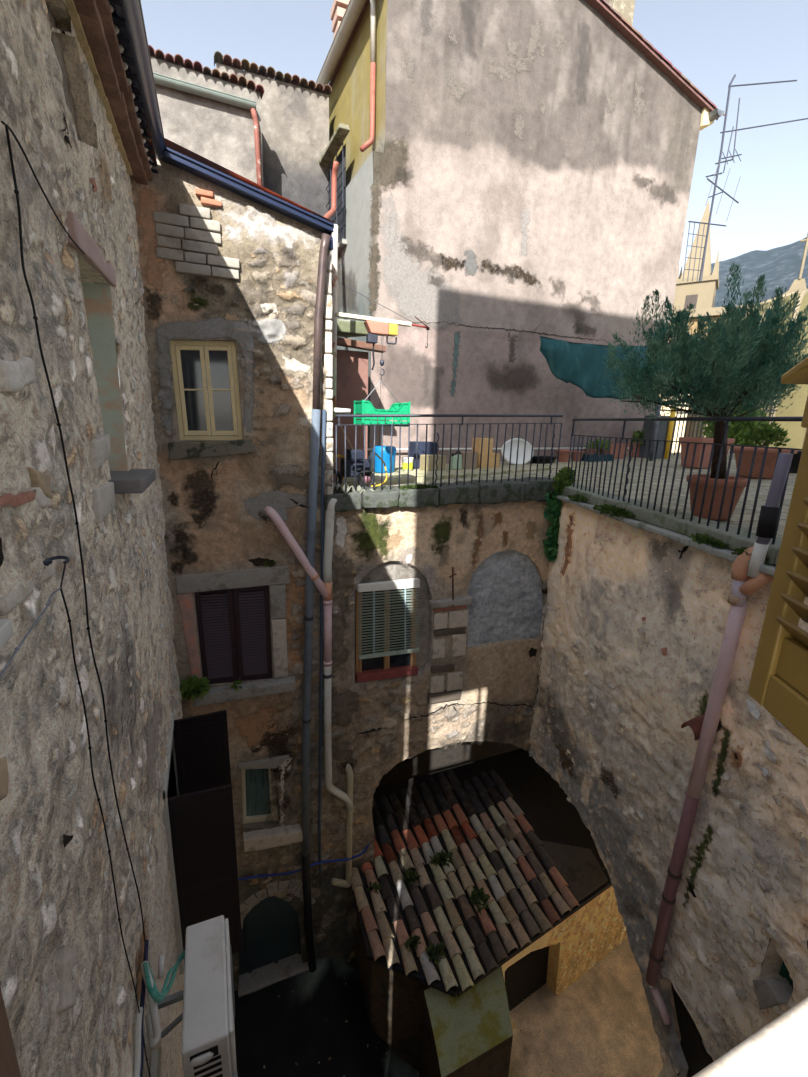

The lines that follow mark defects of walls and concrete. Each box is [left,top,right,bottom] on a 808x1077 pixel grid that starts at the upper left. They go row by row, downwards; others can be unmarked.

spalling [368,141,408,312]
water stain [381,198,466,396]
water stain [481,211,540,285]
rust [562,514,573,576]
crack [356,609,546,737]